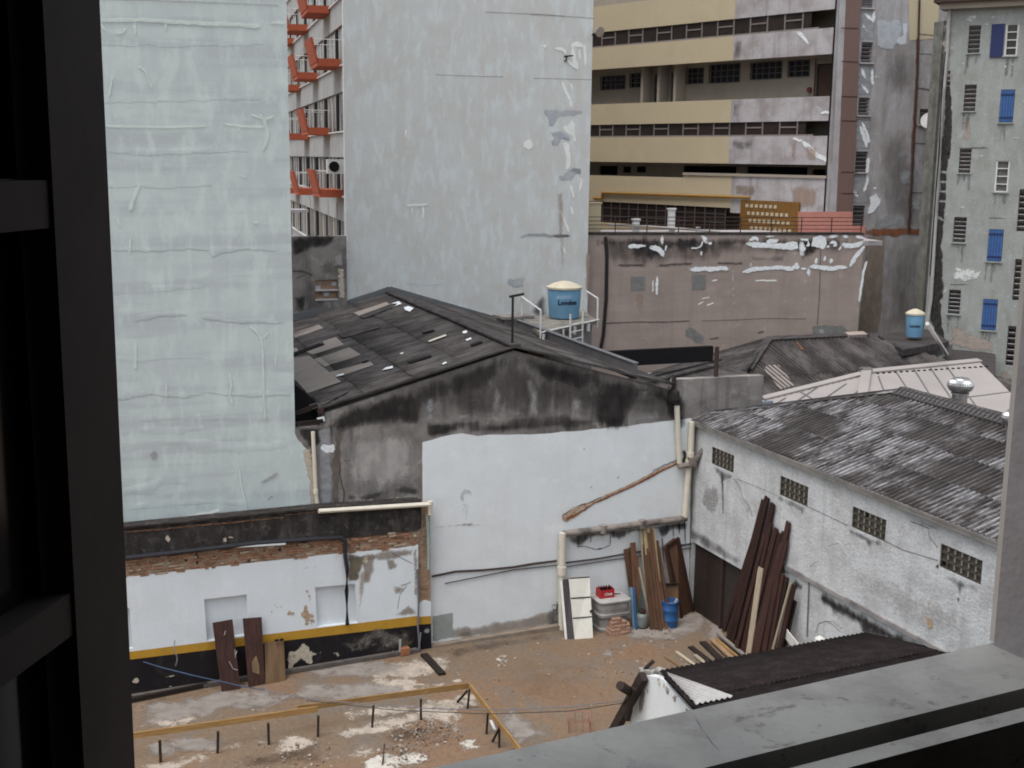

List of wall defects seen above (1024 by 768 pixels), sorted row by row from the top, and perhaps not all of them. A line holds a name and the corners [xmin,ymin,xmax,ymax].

peeling [953,268,982,281]
leakage [338,360,589,435]
leakage [597,384,657,426]
leakage [656,393,684,427]
crack [807,506,861,574]
crack [884,521,938,561]
peeling [348,555,368,594]
leakage [821,594,914,644]
peeling [287,644,316,668]